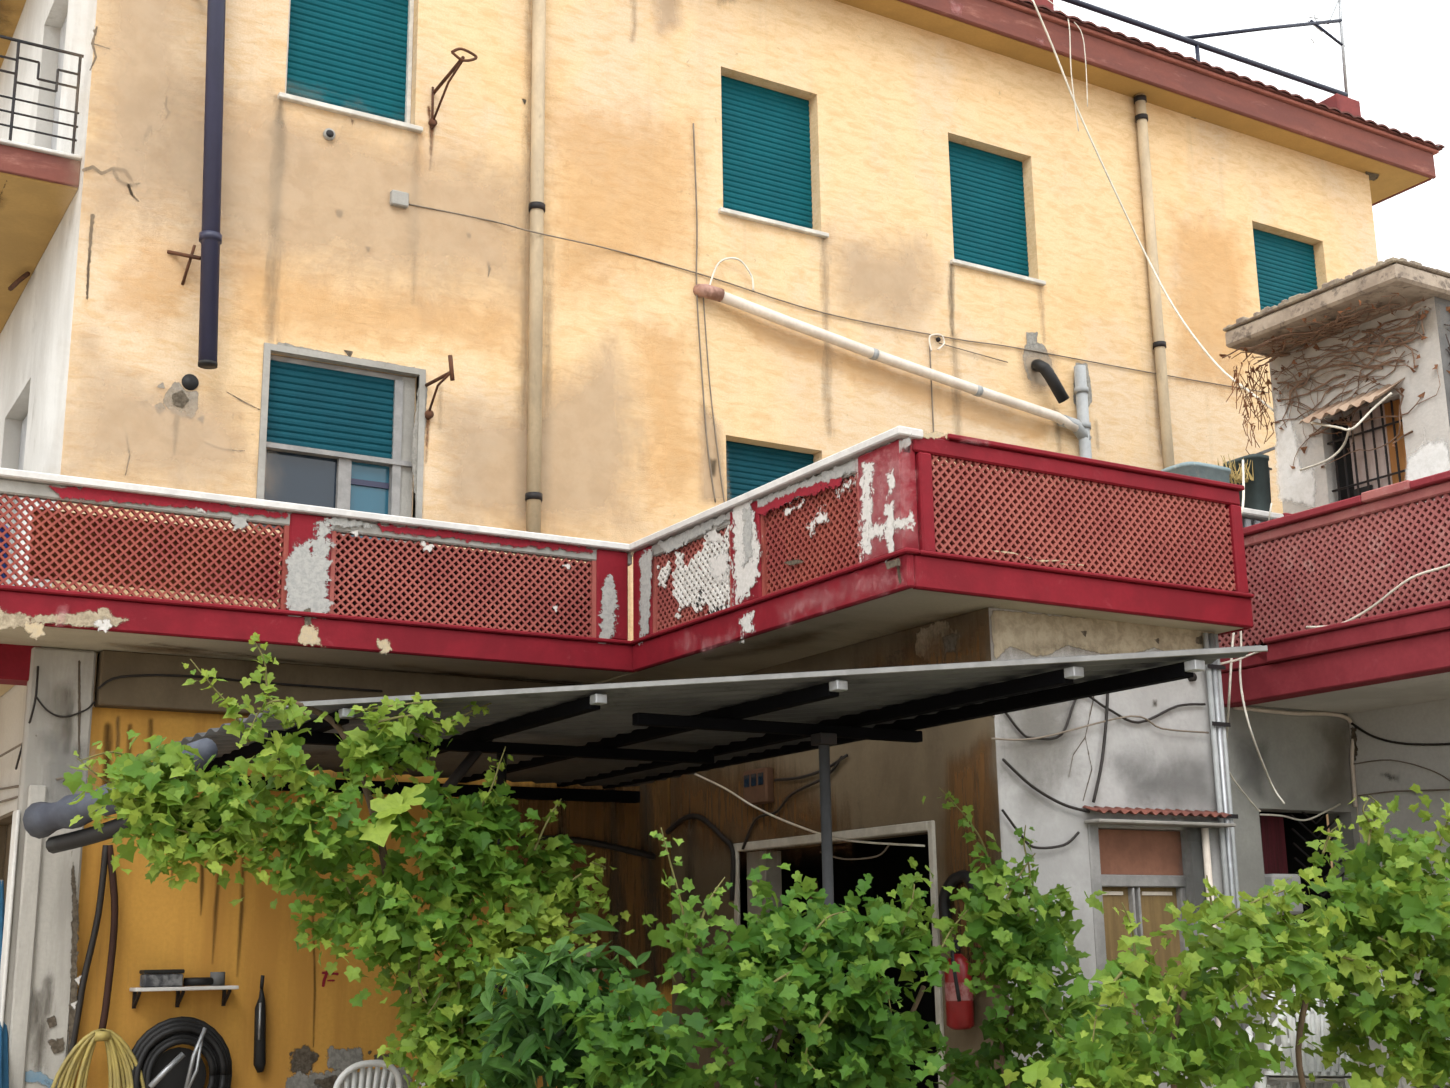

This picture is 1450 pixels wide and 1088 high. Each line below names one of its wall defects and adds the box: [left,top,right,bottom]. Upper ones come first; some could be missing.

crack [90,26,110,70]
crack [82,165,140,202]
crack [86,214,95,299]
spalling [155,374,204,419]
peeling [49,485,288,530]
peeling [638,414,949,646]
peeling [284,517,593,646]
spalling [0,607,129,640]
peeling [598,574,619,644]